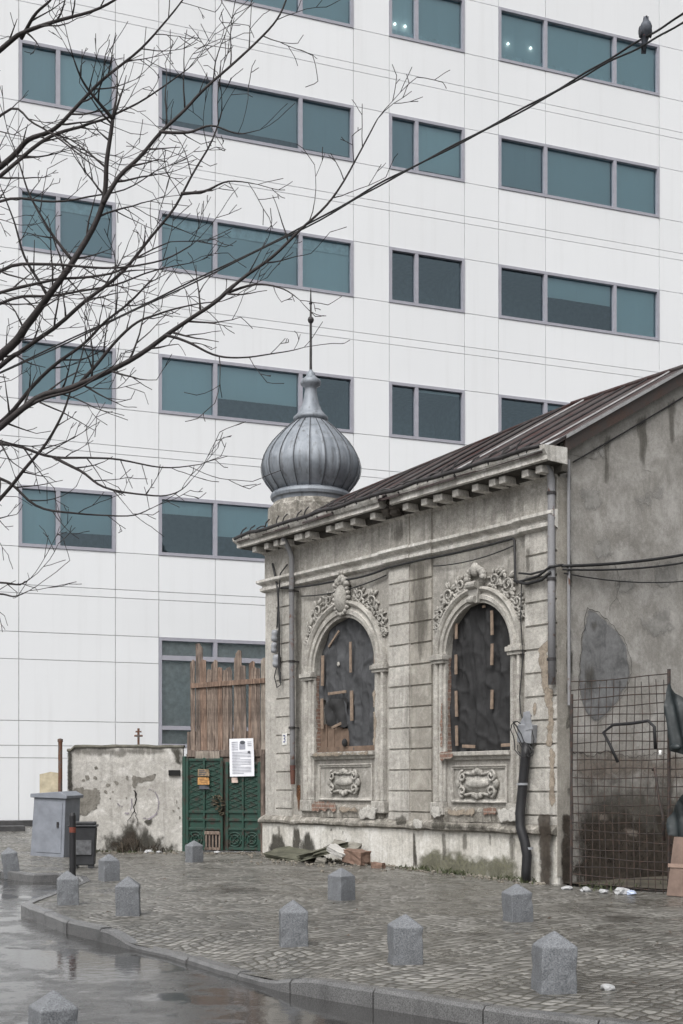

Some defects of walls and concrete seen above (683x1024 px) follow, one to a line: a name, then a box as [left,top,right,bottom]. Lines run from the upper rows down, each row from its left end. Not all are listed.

spalling [533,640,555,806]
peeling [73,766,156,816]
water stain [103,819,173,851]
water stain [538,780,677,884]